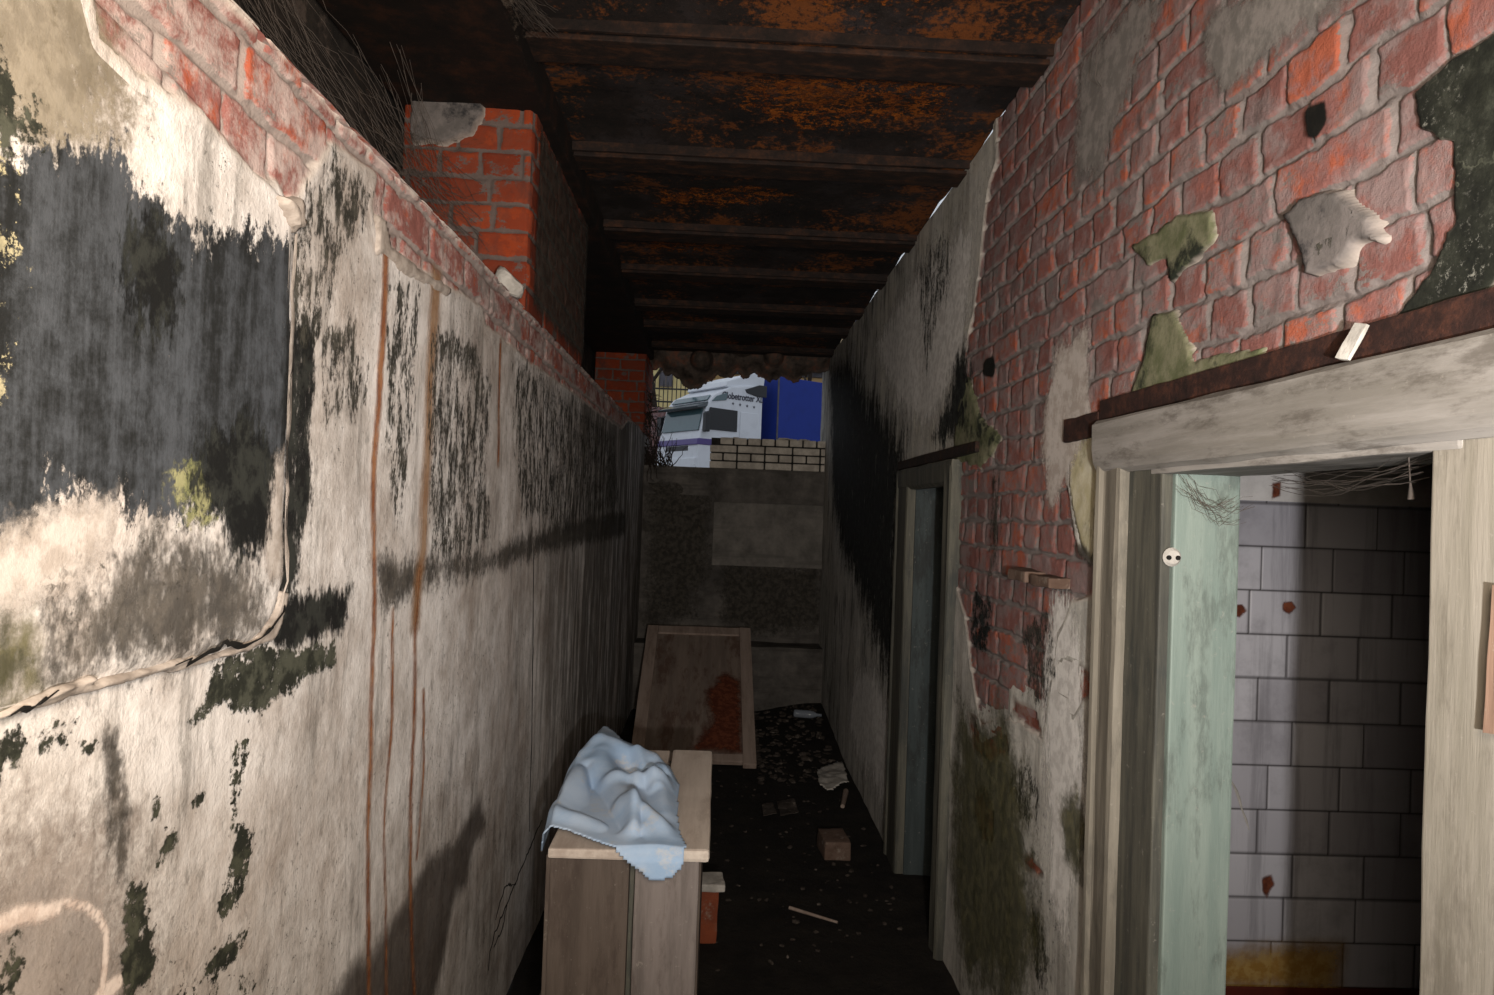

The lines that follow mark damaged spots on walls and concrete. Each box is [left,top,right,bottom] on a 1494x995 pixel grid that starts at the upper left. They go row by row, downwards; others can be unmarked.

water stain [0,45,378,995]
corrosion [366,254,394,995]
corrosion [409,269,441,995]
water stain [378,271,821,635]
corrosion [655,186,801,207]
corrosion [736,77,962,135]
flaking render [956,0,1494,763]